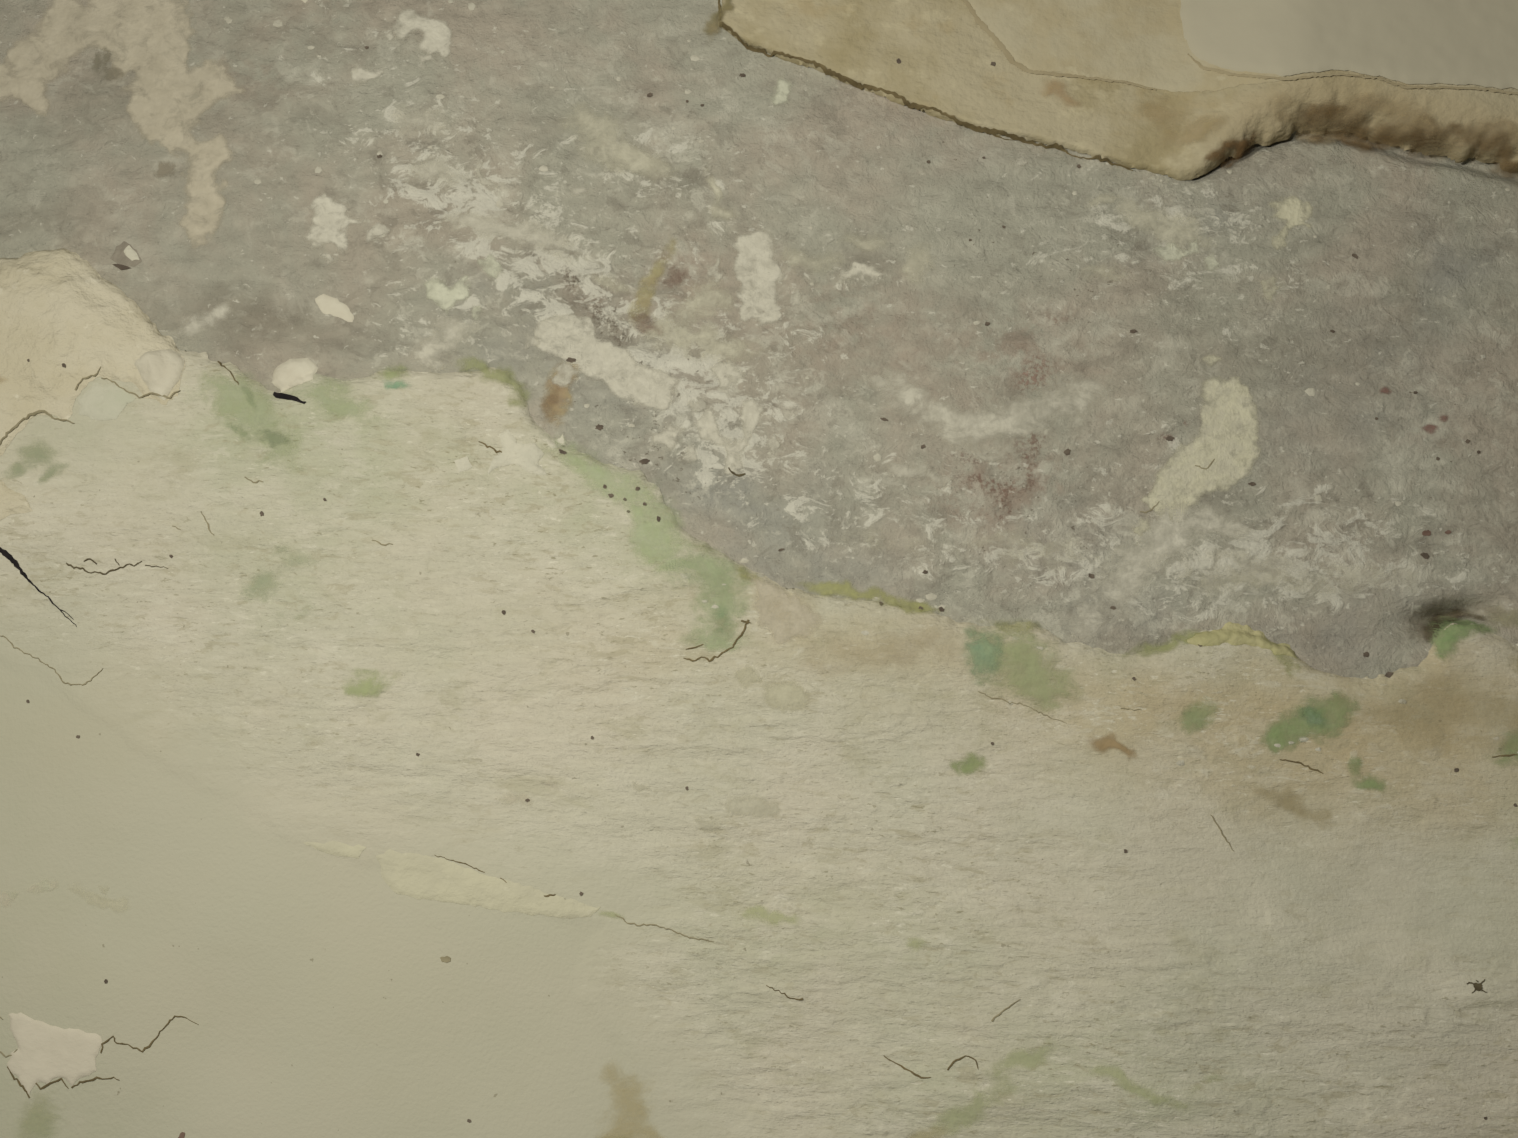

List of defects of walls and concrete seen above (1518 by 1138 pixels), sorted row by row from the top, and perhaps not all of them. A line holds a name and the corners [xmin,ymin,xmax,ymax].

damp [1206,135,1256,166]
damp [1299,96,1518,177]
spalling [0,0,1518,679]
crack [0,547,77,627]
crack [66,558,168,575]
crack [684,620,751,662]
peeling [0,1012,197,1098]